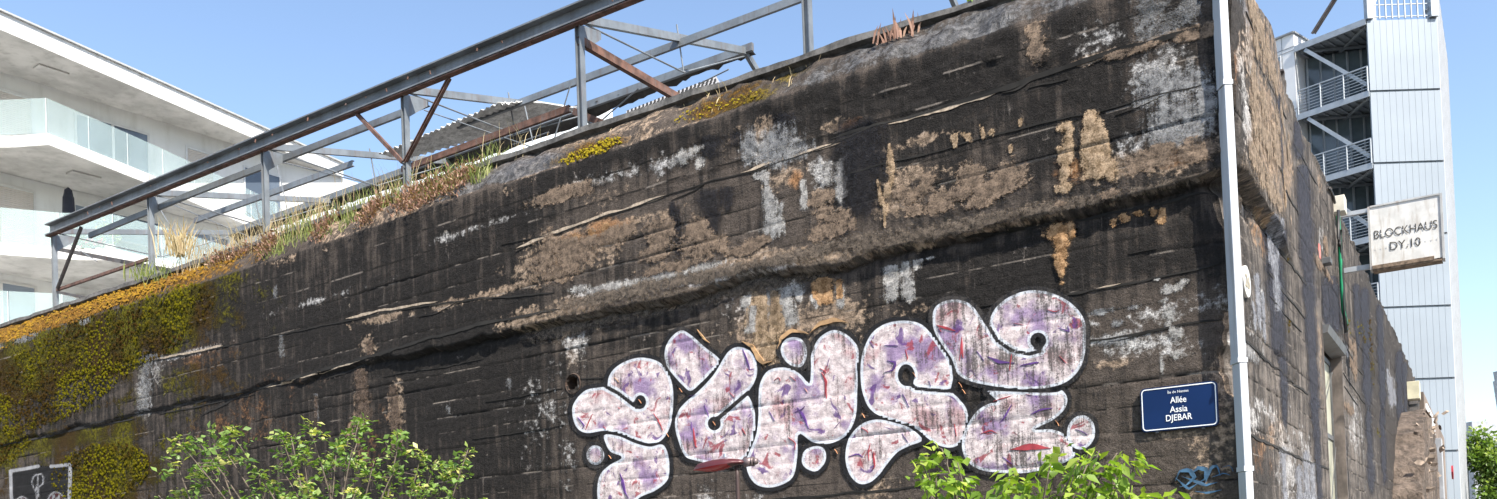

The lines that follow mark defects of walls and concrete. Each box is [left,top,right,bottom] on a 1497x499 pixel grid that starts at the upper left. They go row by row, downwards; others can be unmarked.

crack [0,292,559,446]
water stain [570,201,727,294]
water stain [671,112,888,239]
spalling [521,0,1291,343]
water stain [1134,66,1217,144]
water stain [1252,94,1408,499]